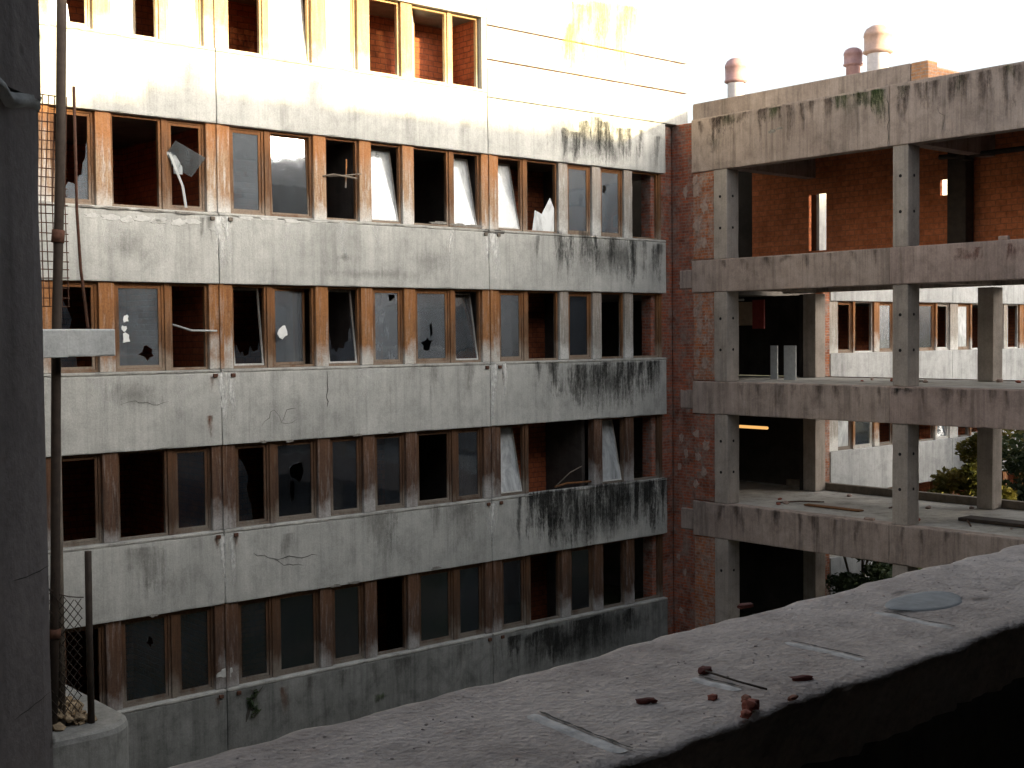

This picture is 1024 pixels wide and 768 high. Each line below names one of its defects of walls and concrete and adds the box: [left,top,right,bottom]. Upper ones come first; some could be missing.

damp [898,70,989,109]
damp [699,89,883,137]
damp [562,117,642,156]
damp [554,231,662,269]
damp [576,361,659,393]
damp [518,478,670,536]
crack [255,554,315,566]